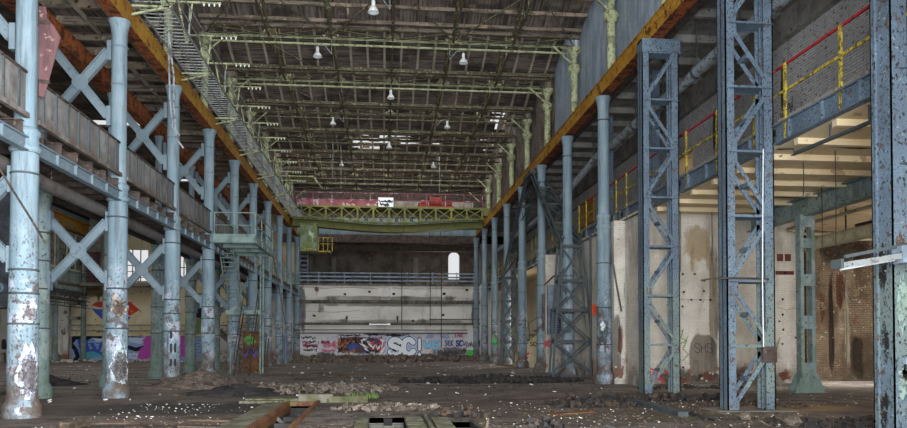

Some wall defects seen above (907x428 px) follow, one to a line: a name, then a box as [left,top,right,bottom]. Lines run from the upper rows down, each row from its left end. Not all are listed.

corrosion [112,300,125,316]
damp [680,227,719,384]
damp [829,279,863,375]
peeling [1,339,39,400]
corrosion [114,352,127,385]